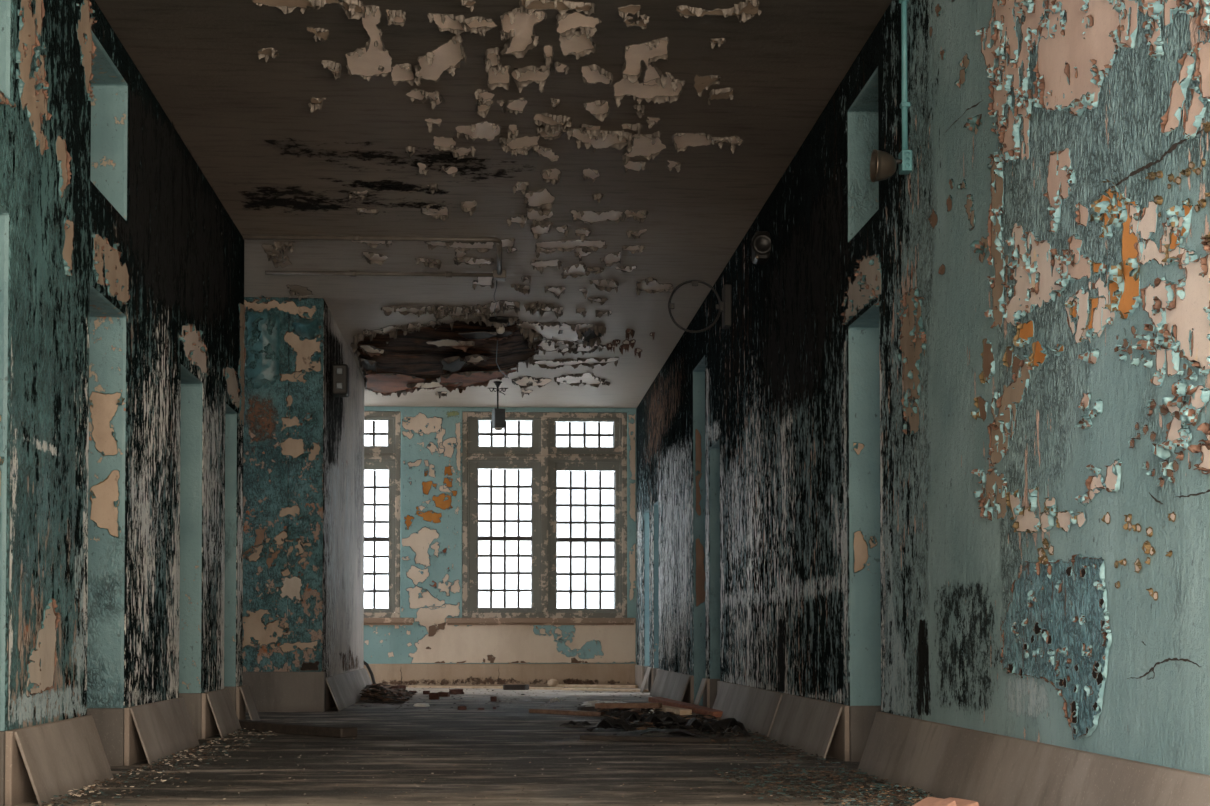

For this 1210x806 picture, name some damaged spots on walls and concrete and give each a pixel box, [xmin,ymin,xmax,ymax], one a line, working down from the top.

peeling [252,0,743,398]
leakage [9,324,61,592]
leakage [8,383,89,726]
leakage [127,380,181,691]
peeling [242,504,318,656]
peeling [364,412,636,664]
leakage [643,341,848,703]
peeling [928,0,1210,741]
crack [1127,642,1200,680]